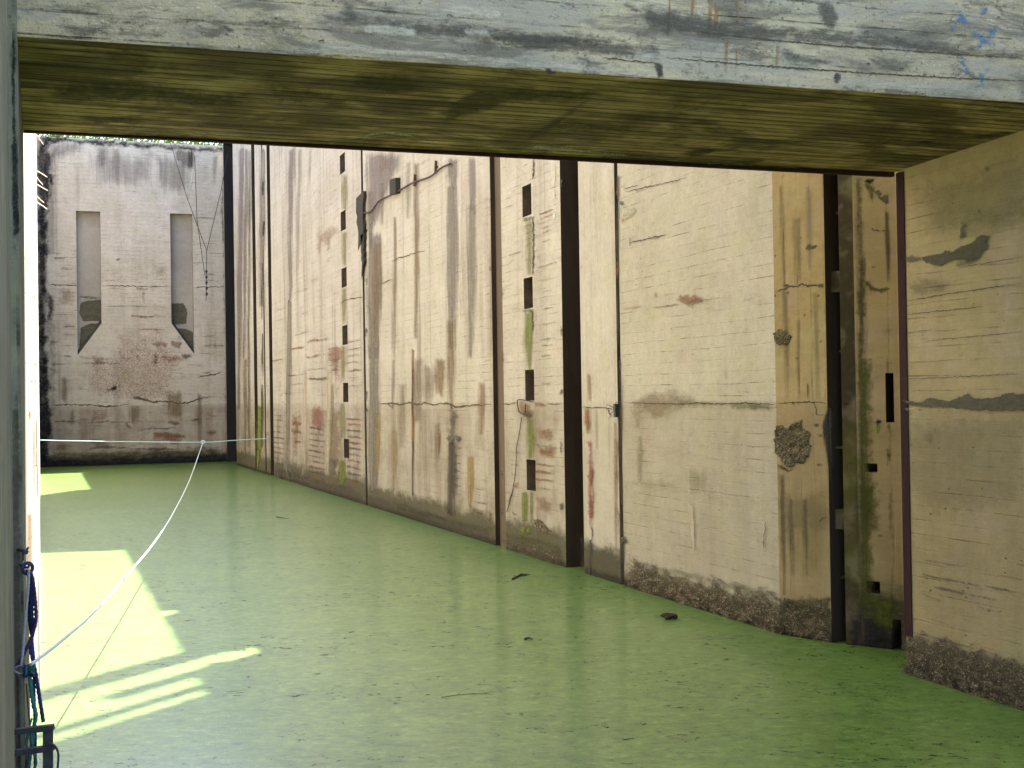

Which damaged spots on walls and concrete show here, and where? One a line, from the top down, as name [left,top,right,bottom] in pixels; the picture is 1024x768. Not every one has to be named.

corrosion [663,295,701,307]
water stain [275,150,489,538]
spalling [773,329,792,346]
crack [29,359,220,497]
crack [376,401,516,409]
crack [551,401,825,420]
spalling [773,407,832,473]
water stain [848,292,895,649]